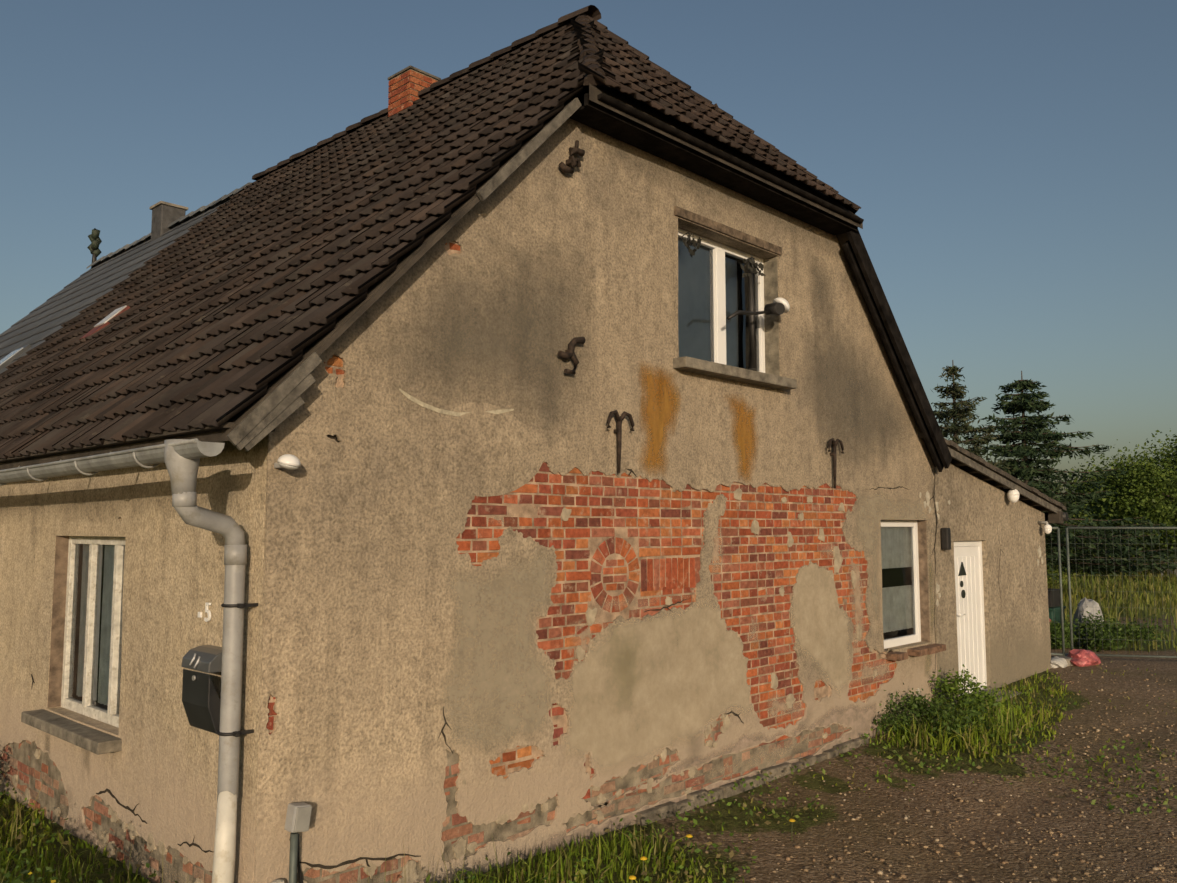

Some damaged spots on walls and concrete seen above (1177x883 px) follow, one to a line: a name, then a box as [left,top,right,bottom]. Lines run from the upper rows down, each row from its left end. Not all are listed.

flaking render [324,355,344,388]
rust [643,371,678,468]
rust [735,403,754,474]
flaking render [441,462,897,862]
flaking render [266,695,277,735]
flaking render [0,740,212,883]
crack [96,789,147,824]
crack [178,836,214,853]
flaking render [297,856,430,883]